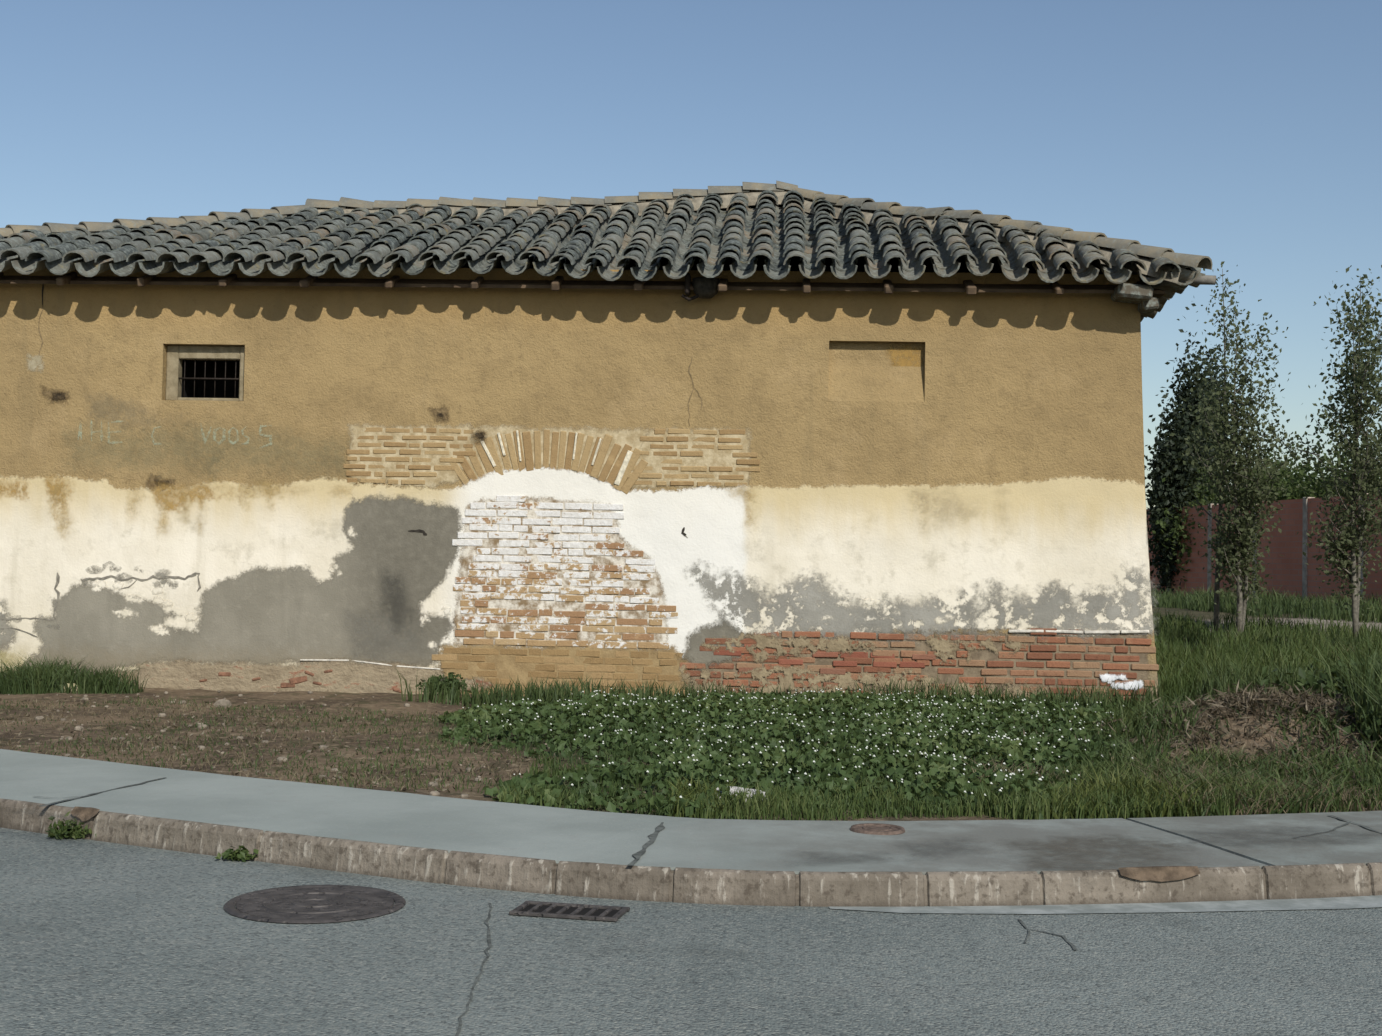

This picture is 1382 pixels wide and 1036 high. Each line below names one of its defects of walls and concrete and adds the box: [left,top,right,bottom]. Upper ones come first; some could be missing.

spalling [472,431,486,444]
peeling [0,467,1156,694]